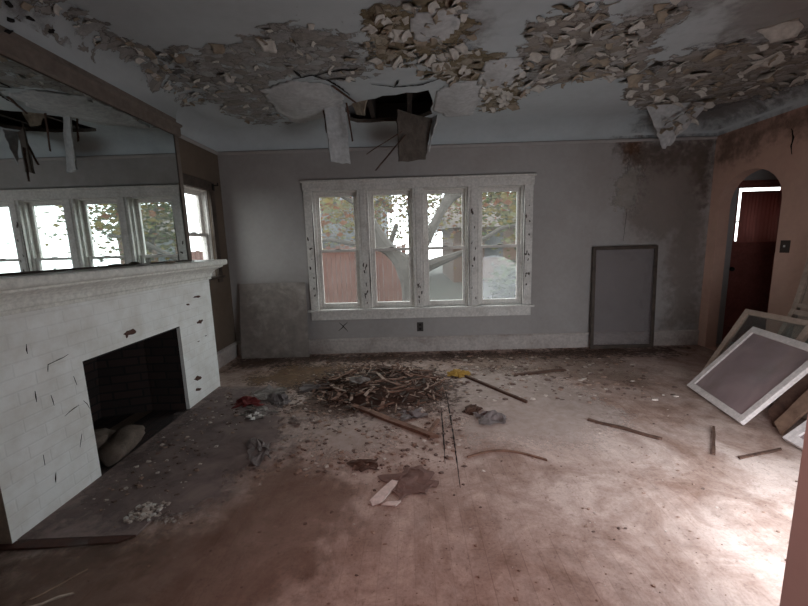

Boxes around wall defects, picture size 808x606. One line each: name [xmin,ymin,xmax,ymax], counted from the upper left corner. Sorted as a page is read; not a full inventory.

peeling [0,0,808,171]